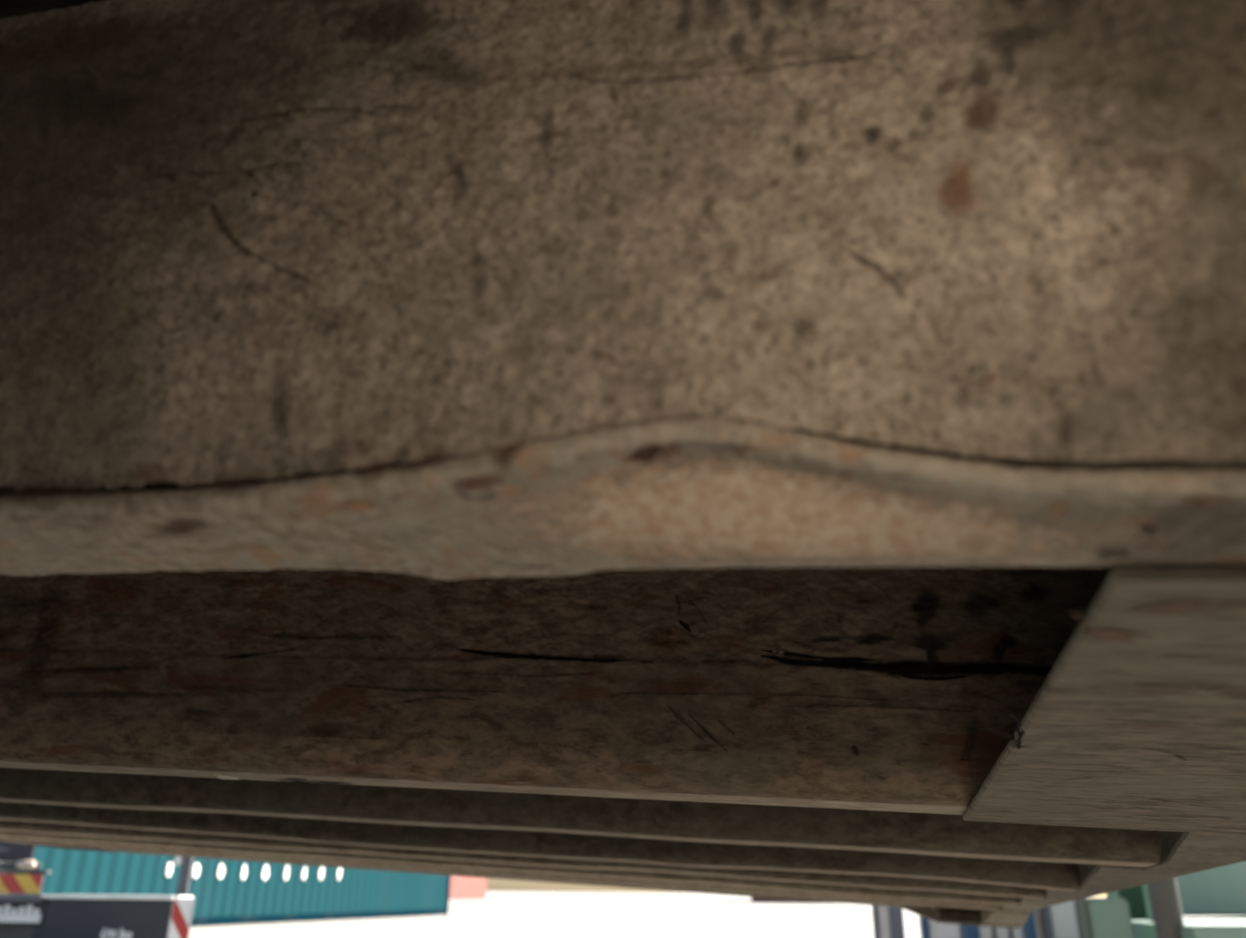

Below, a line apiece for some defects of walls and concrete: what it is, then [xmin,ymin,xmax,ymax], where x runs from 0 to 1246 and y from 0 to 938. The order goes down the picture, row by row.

crack [563,54,887,104]
crack [220,634,393,659]
crack [456,649,653,663]
crack [701,650,1053,681]